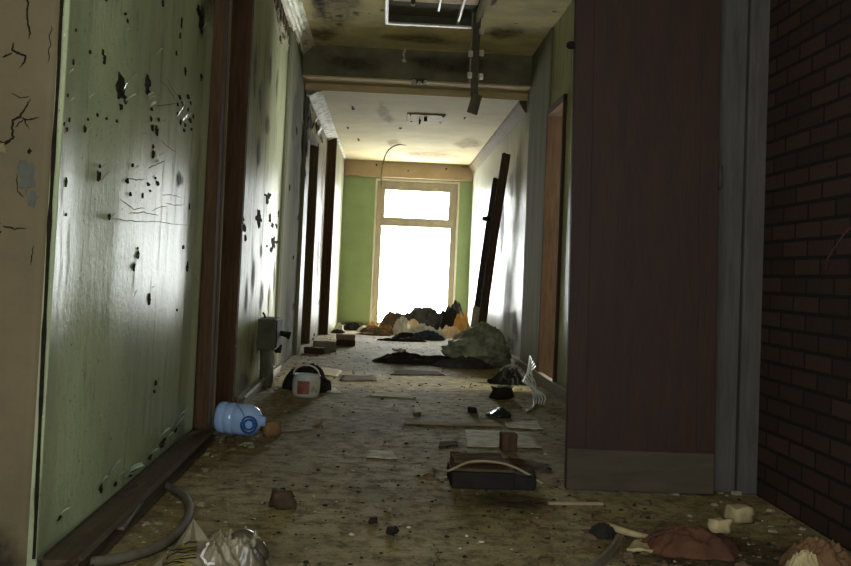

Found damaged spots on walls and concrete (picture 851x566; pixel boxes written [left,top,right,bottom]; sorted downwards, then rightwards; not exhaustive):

peeling [115,71,165,162]
peeling [255,193,279,258]
crack [0,0,64,559]